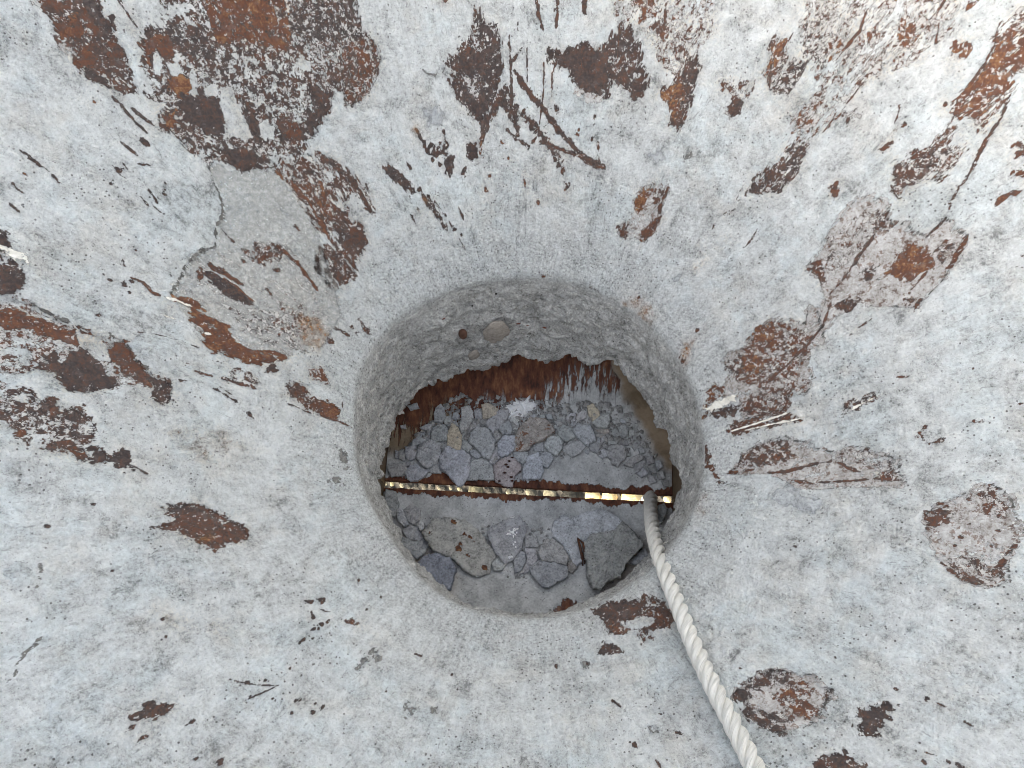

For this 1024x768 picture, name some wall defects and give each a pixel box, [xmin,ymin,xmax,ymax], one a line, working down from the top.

rust [412,5,508,178]
rust [535,0,560,30]
rust [546,0,717,132]
rust [0,0,381,475]
rust [704,0,1024,490]
spalling [439,446,472,488]
spalling [513,416,564,481]
rust [150,502,249,553]
spalling [385,489,648,591]
rust [921,482,1024,589]
rust [590,593,675,656]
rust [730,667,838,737]